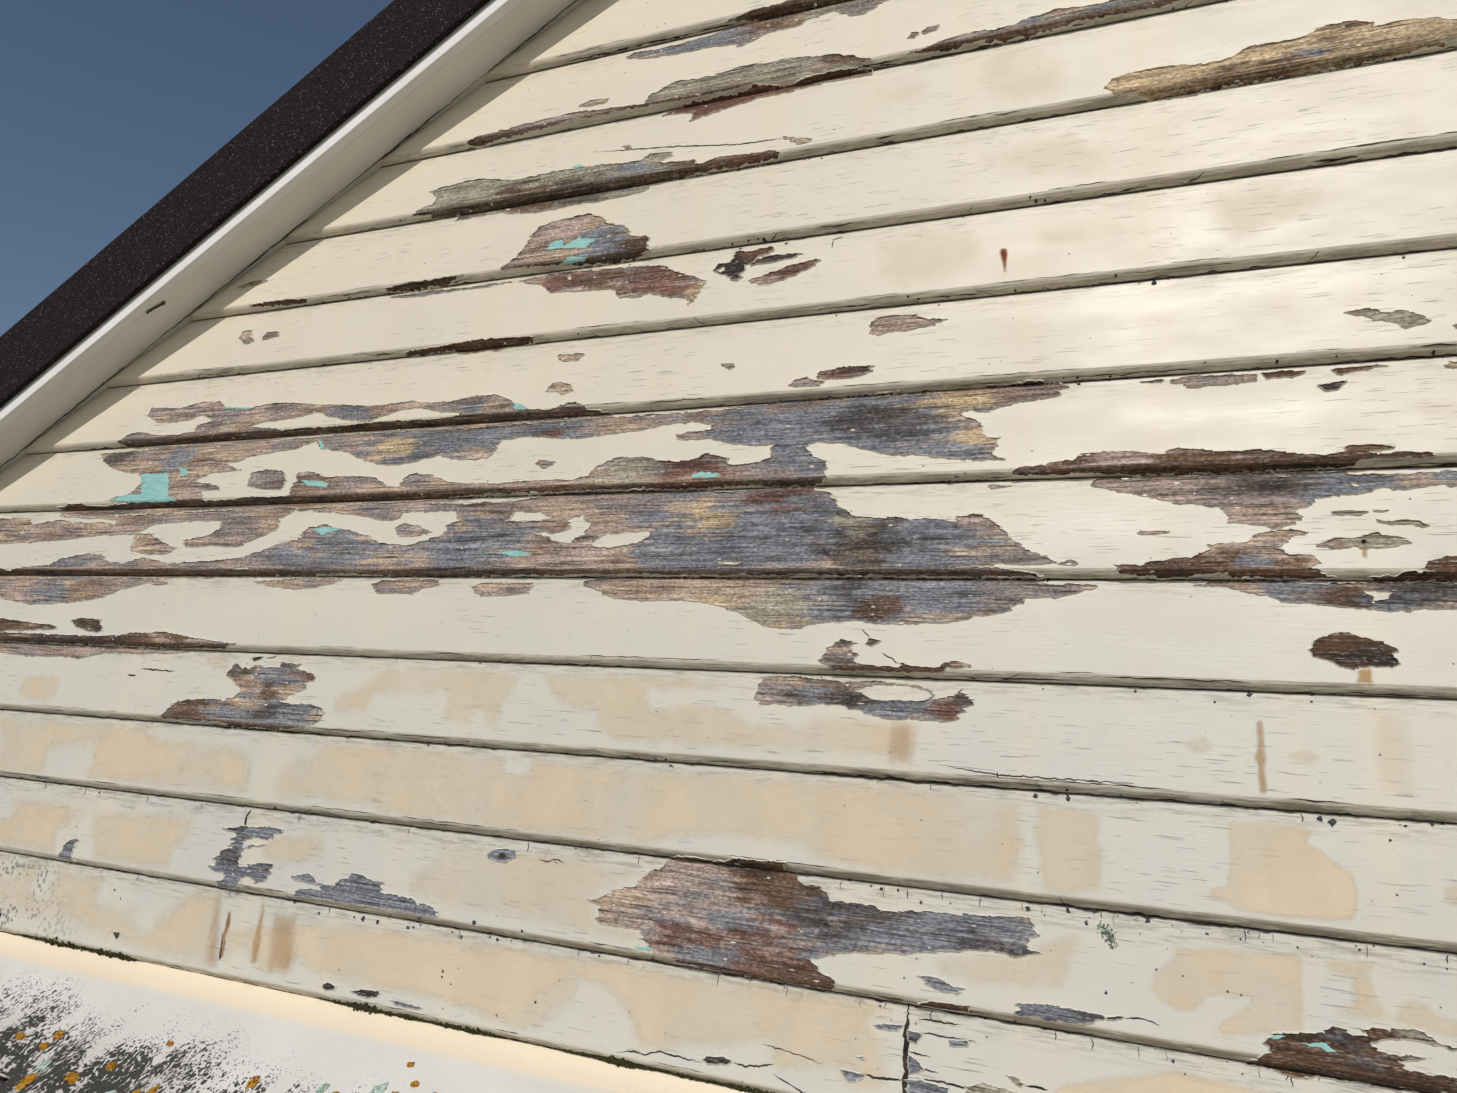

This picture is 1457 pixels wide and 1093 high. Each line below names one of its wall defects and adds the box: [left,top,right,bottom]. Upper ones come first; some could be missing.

peeling [903,0,1193,57]
peeling [1104,17,1457,101]
peeling [384,136,821,305]
peeling [1343,307,1432,329]
peeling [557,353,585,362]
peeling [0,364,1457,732]
peeling [207,825,284,890]
peeling [291,873,439,918]
peeling [586,855,1043,991]
crack [0,850,1432,1093]
peeling [916,974,971,1013]
peeling [1245,1025,1457,1093]